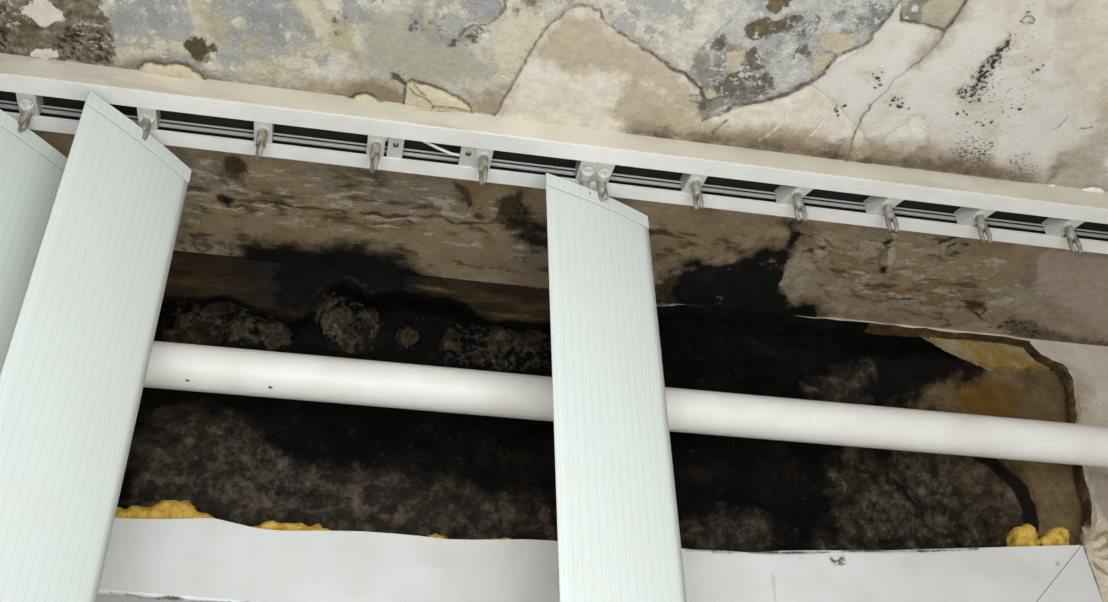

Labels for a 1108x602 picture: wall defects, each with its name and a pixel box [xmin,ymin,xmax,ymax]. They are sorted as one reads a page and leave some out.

crack [494,0,901,131]
damp [826,34,1045,178]
damp [164,149,550,323]
flaking render [154,281,552,377]
flaking render [657,231,1077,424]
flaking render [117,379,558,541]
flaking render [669,431,1092,552]